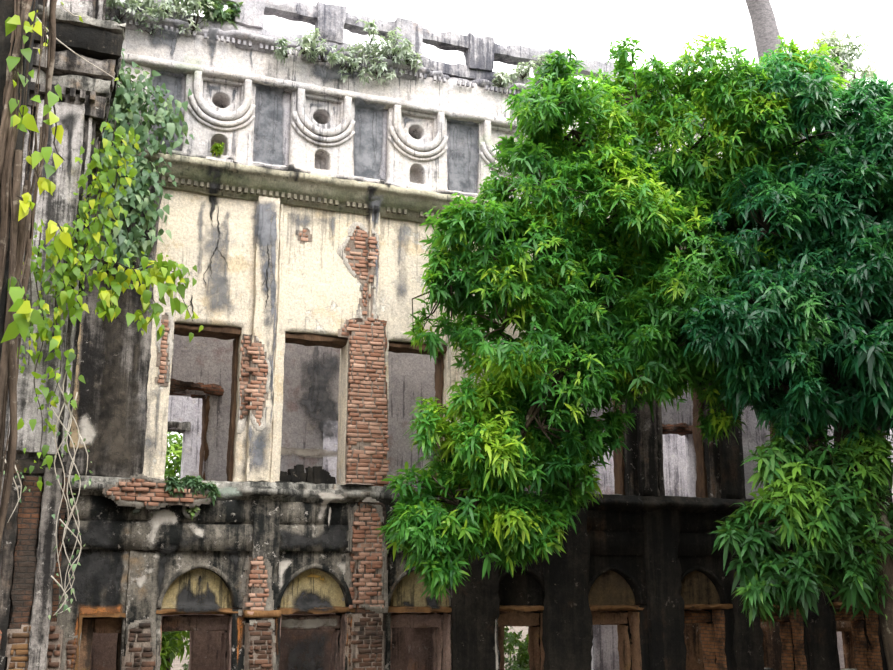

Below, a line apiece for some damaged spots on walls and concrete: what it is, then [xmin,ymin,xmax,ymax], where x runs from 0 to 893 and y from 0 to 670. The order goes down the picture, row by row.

damp [152,71,229,310]
crack [187,207,229,312]
damp [84,257,160,476]
flaking render [155,312,174,386]
flaking render [237,333,271,433]
damp [244,202,277,472]
flaking render [281,222,390,523]
flaking render [102,474,212,543]
flaking render [5,625,31,670]
damp [176,576,221,613]
flaking render [238,497,388,670]
damp [293,590,333,611]